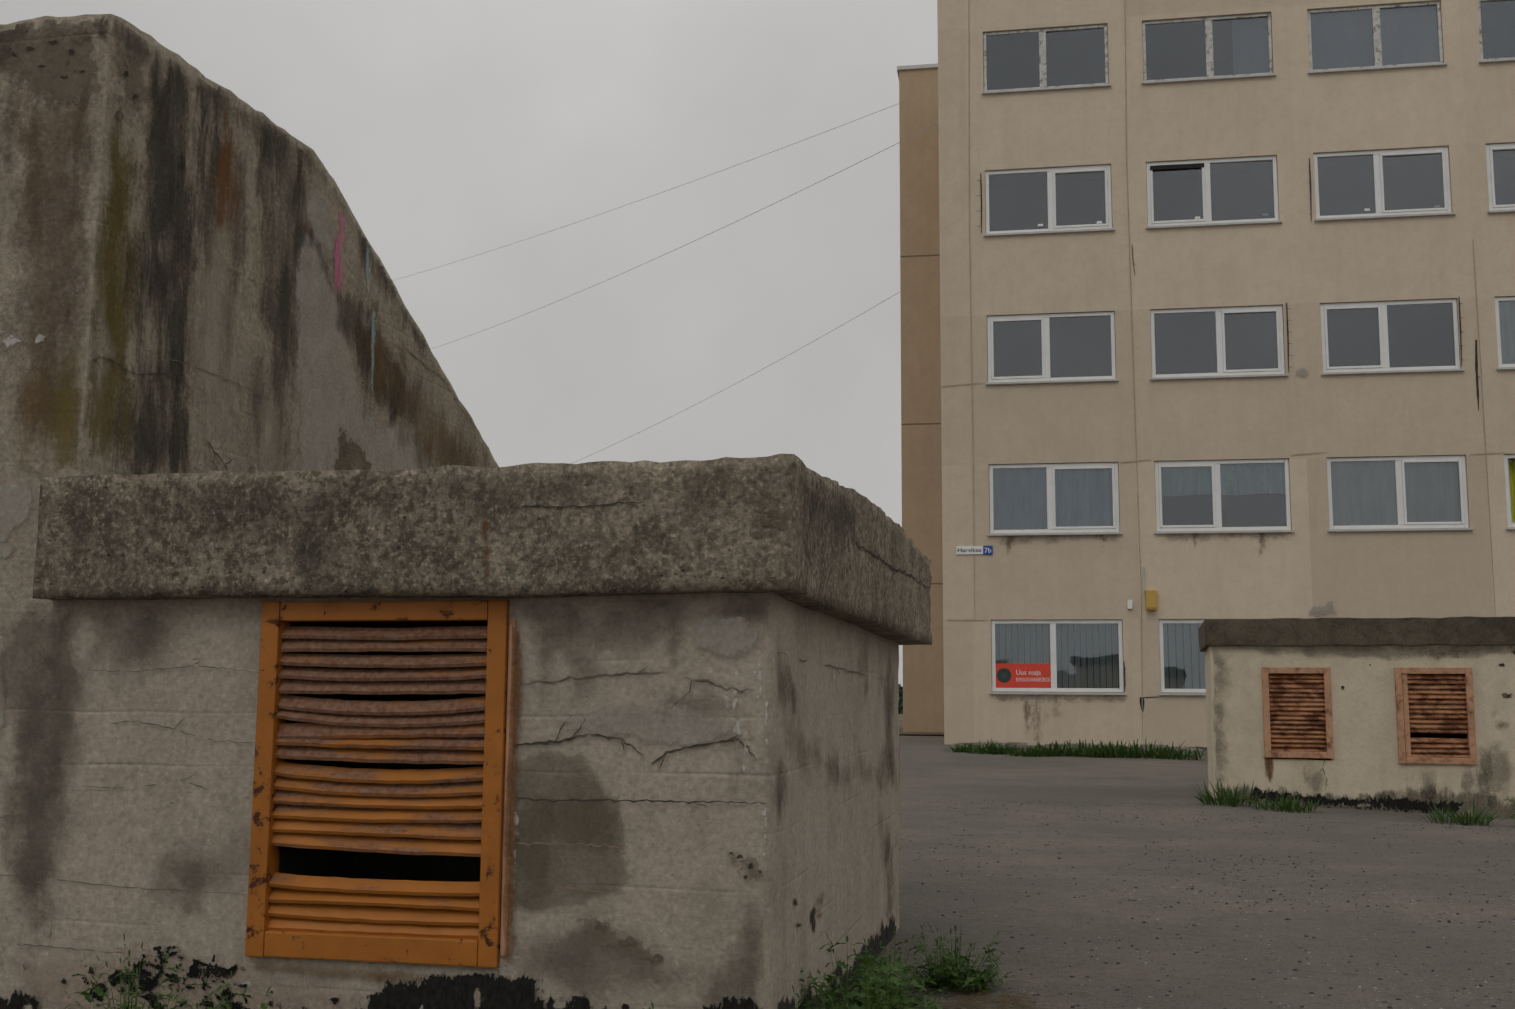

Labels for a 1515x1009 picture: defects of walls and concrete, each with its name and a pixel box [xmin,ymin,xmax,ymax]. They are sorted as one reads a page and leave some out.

water stain [0,19,59,66]
water stain [93,19,239,475]
water stain [245,112,320,400]
peeling [261,190,433,471]
water stain [362,236,425,350]
water stain [339,295,470,465]
peeling [0,945,629,1009]
spalling [576,916,663,973]
peeling [703,996,758,1009]
spalling [794,896,823,932]
peeling [778,914,895,1009]